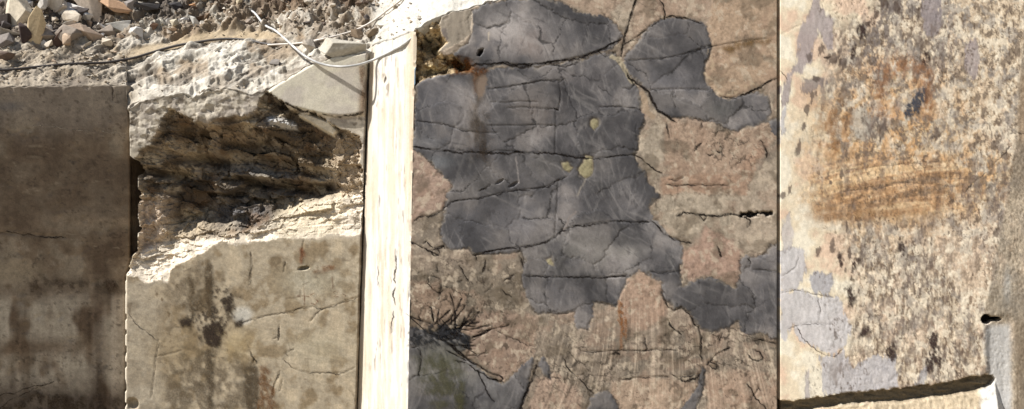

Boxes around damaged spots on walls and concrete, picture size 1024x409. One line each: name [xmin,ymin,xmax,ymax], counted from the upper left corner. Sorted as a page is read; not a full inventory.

spalling [414,19,484,86]
crack [725,73,787,98]
spalling [126,90,366,284]
crack [377,0,772,409]
damp [180,264,242,408]
damp [244,366,258,409]
crack [563,289,843,409]